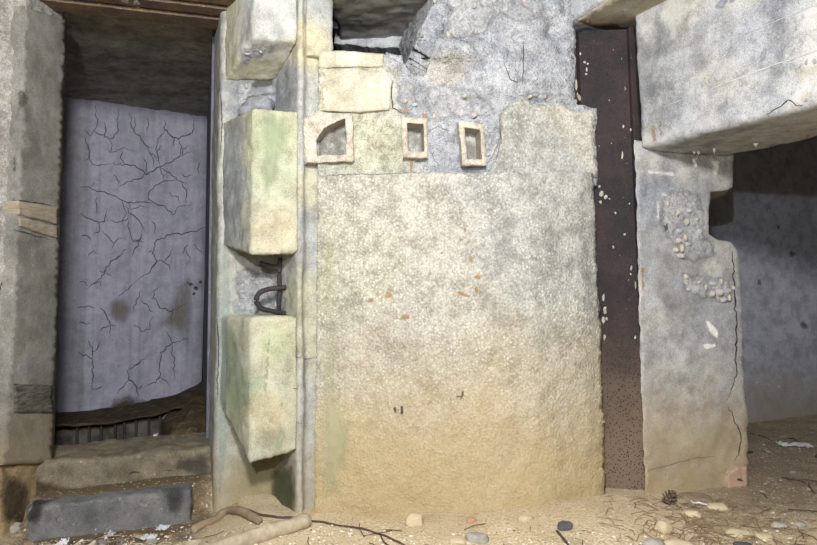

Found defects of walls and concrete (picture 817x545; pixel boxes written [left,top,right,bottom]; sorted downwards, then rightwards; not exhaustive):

spalling [446,0,542,39]
spalling [397,81,494,121]
crack [78,105,204,396]
spalling [662,191,714,261]
spalling [683,274,735,302]
crack [727,251,742,460]